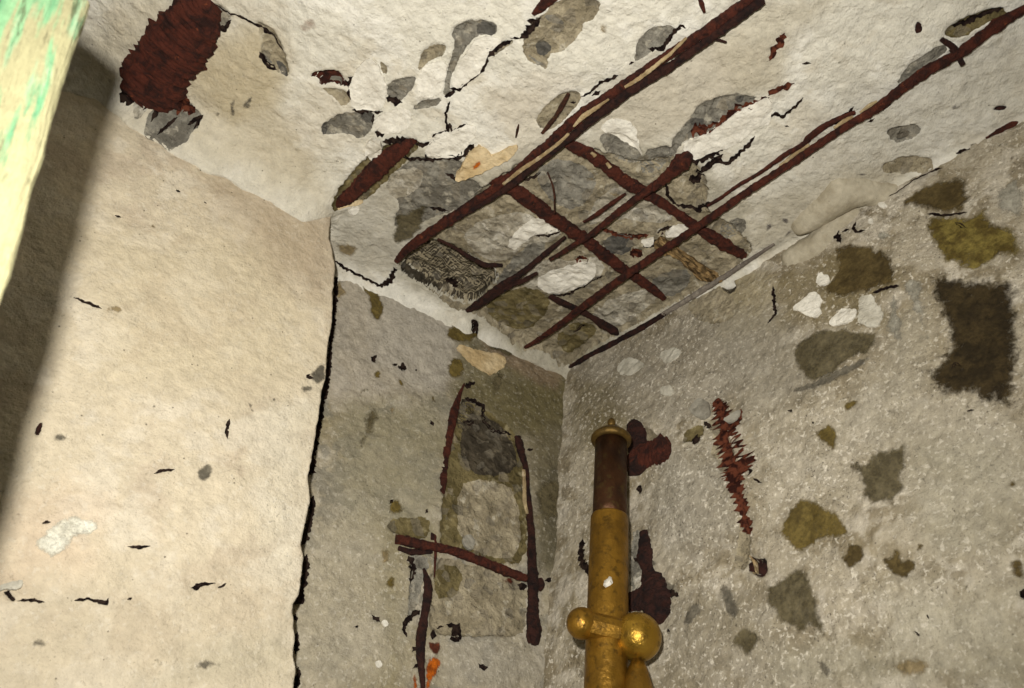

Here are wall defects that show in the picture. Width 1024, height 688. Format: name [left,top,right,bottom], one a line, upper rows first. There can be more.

corrosion [119,0,222,113]
crack [345,18,540,181]
peeling [456,345,506,375]
spalling [321,0,772,367]
crack [570,24,686,104]
corrosion [394,0,1024,368]
damp [794,330,875,391]
damp [887,180,1018,405]
crack [293,261,397,688]
spalling [387,398,528,637]
corrosion [395,435,545,688]
damp [781,499,863,567]